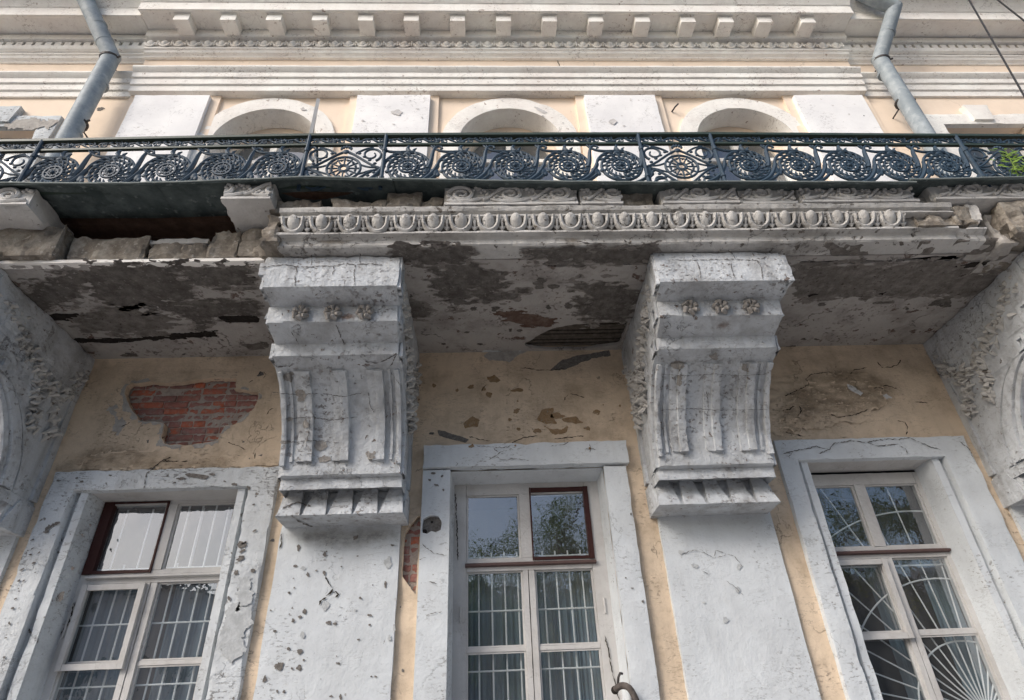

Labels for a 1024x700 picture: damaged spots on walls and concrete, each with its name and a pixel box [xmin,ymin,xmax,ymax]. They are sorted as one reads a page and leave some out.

peeling [0,192,444,357]
peeling [385,240,662,332]
peeling [778,196,1024,310]
flaking render [106,378,262,450]
flaking render [429,416,480,448]
peeling [533,408,590,435]
crack [662,360,973,457]
flaking render [372,518,420,593]
peeling [263,609,306,682]